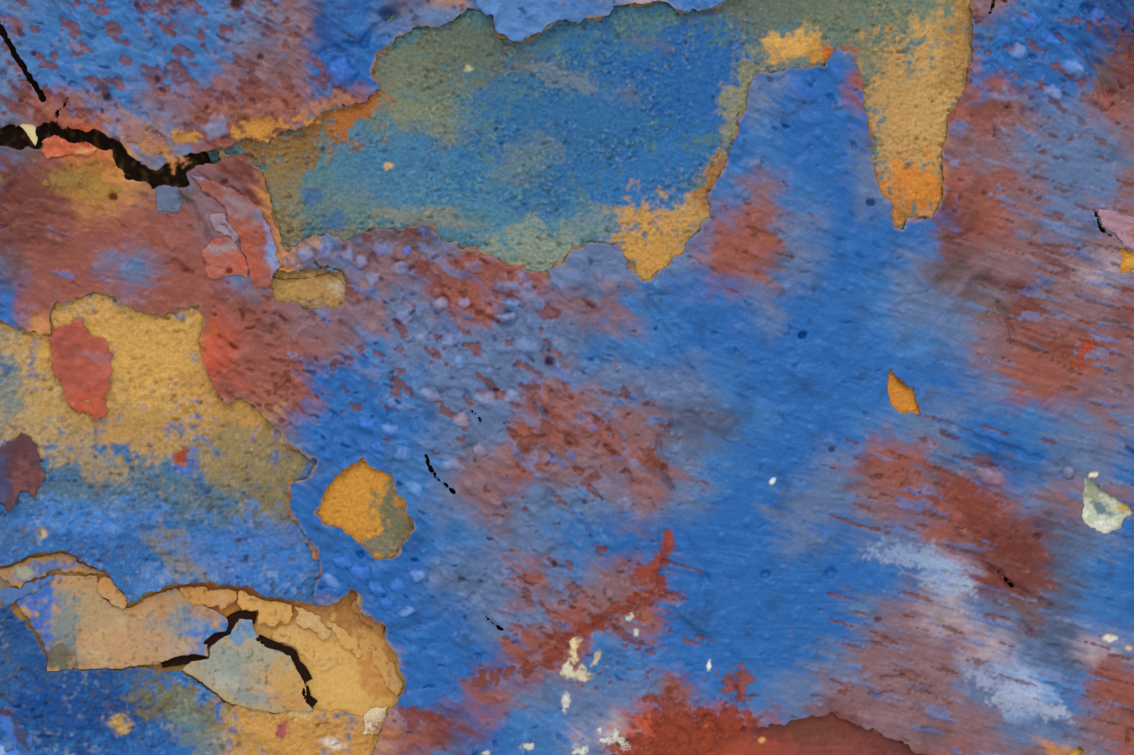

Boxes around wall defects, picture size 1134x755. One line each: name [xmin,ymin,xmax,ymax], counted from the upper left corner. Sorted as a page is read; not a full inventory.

crack [0,21,213,212]
flaking render [191,0,978,312]
peeling [887,369,920,414]
peeling [0,292,415,755]
peeling [1082,478,1132,533]